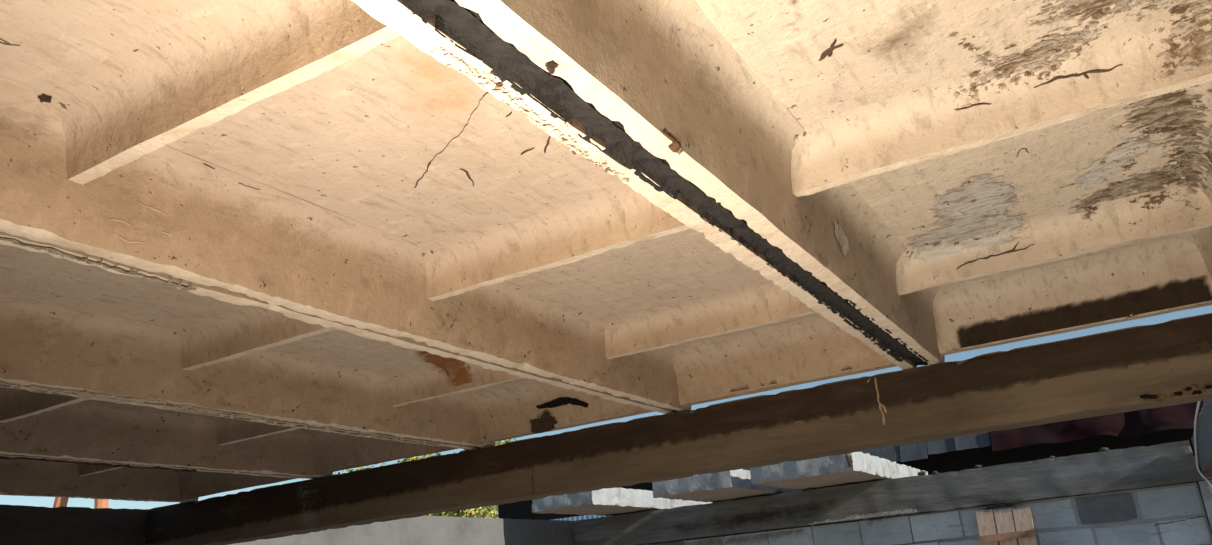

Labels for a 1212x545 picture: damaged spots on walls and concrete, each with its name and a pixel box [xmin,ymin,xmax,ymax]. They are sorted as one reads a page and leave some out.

crack [1034,64,1122,88]
peeling [949,0,1212,107]
crack [414,92,489,188]
crack [520,137,551,155]
peeling [1061,86,1212,235]
peeling [905,169,1030,262]
rust [419,351,471,386]
water stain [145,314,1212,545]